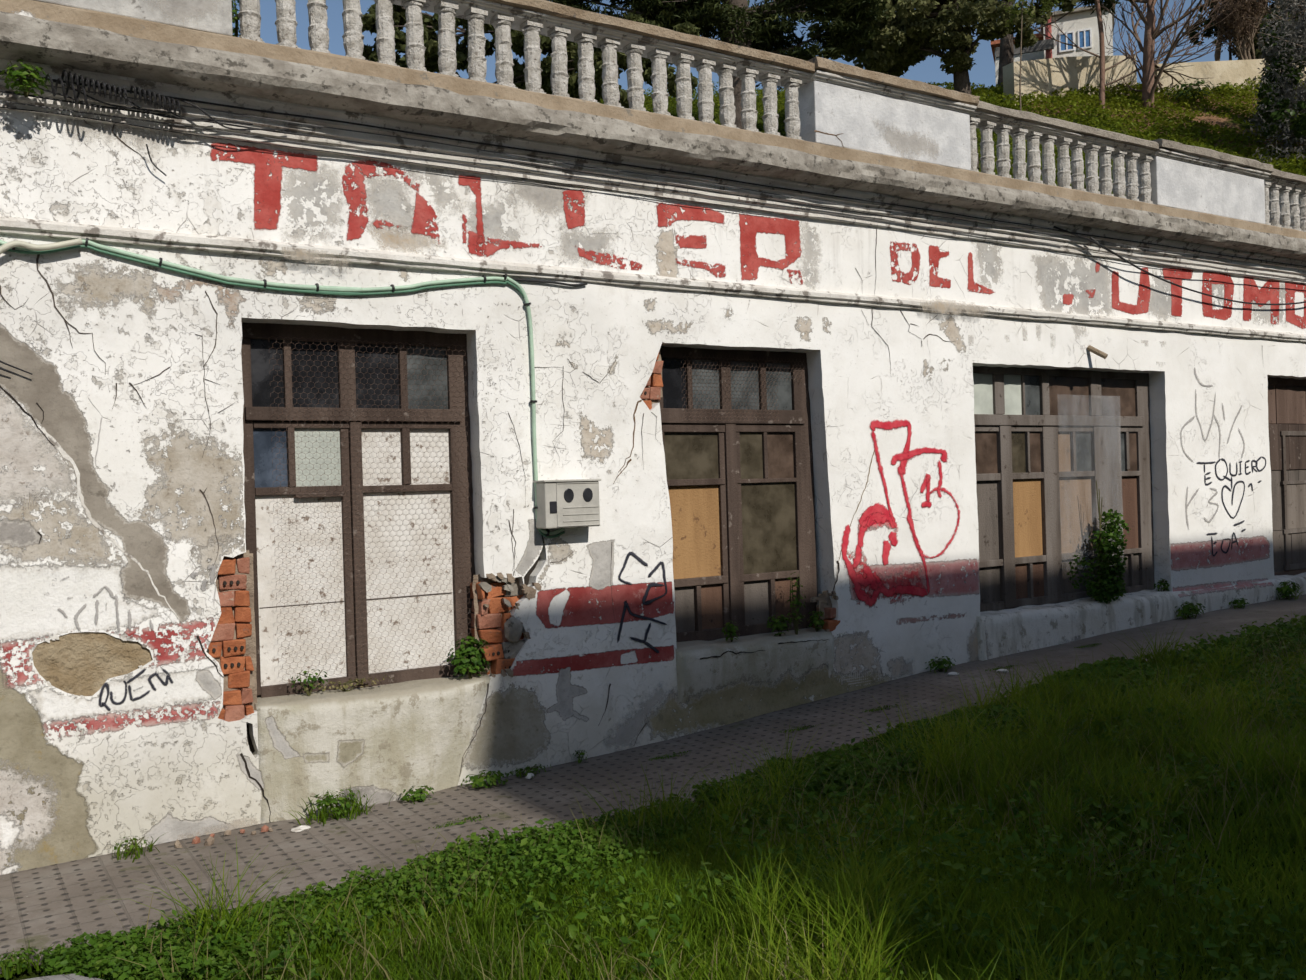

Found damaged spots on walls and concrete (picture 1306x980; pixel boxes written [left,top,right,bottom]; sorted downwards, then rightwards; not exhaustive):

crack [0,254,170,409]
crack [0,386,55,446]
crack [195,291,232,566]
peeling [0,323,257,875]
peeling [462,519,614,779]
peeling [237,754,265,790]
crack [240,722,271,820]